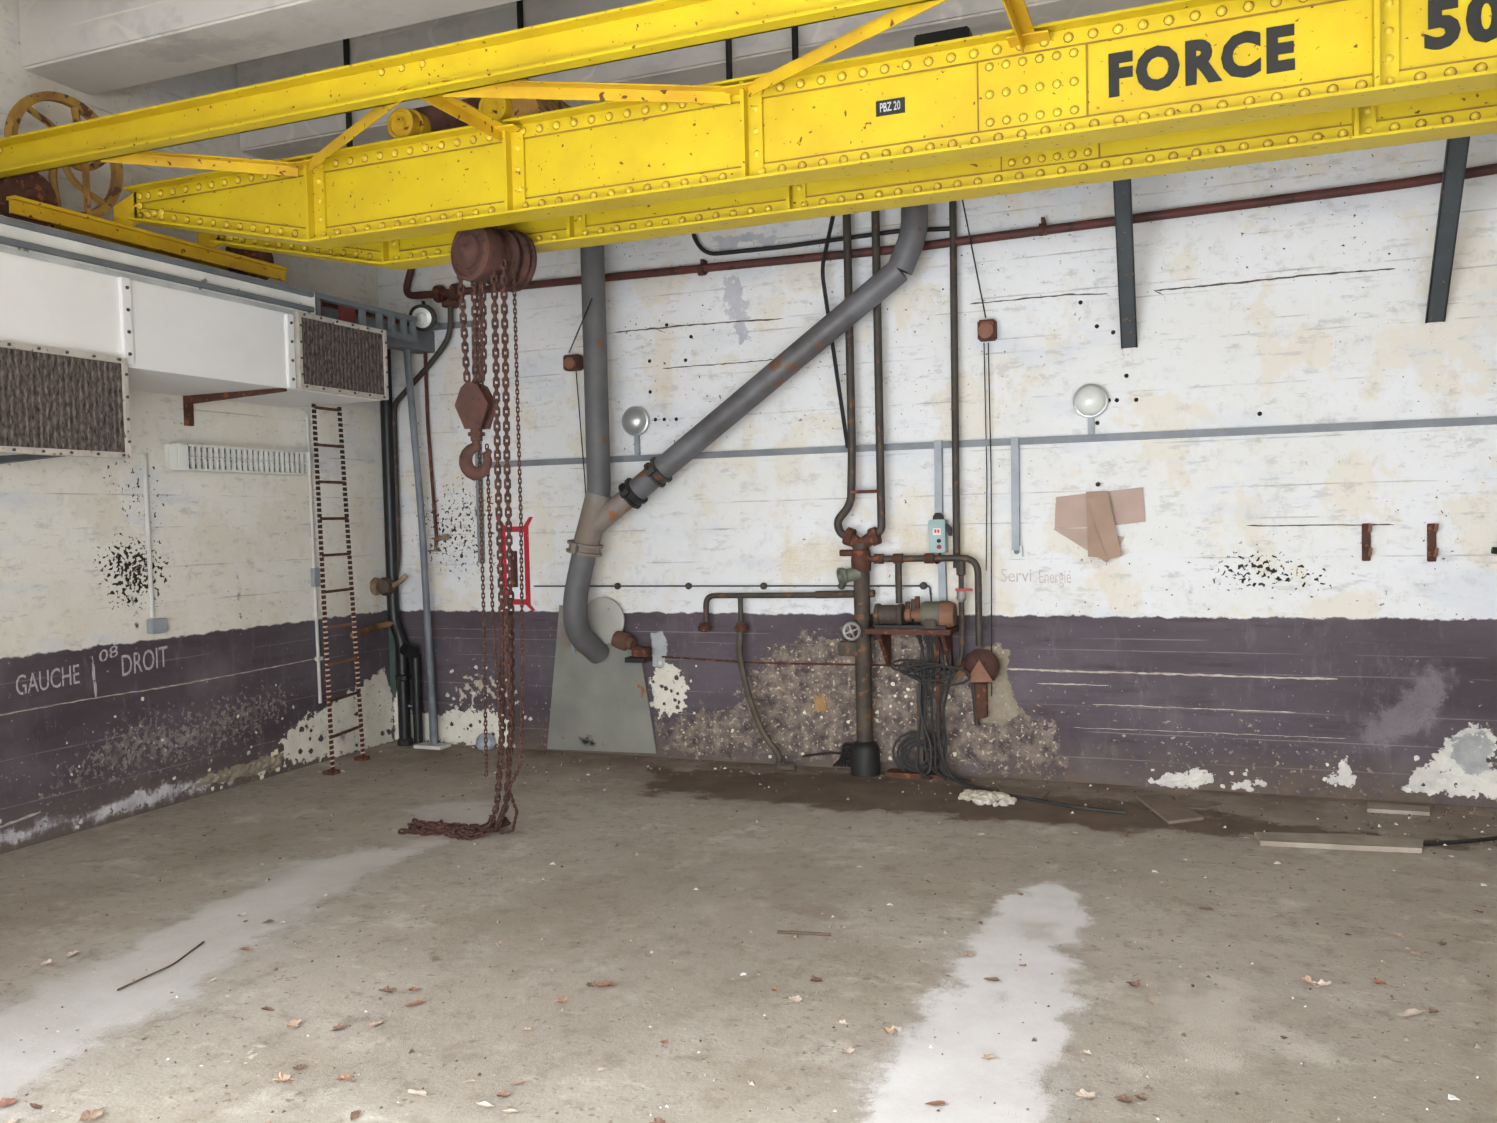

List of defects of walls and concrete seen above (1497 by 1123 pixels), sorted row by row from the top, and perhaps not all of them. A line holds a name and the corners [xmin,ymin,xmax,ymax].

leakage [94,461,171,630]
leakage [416,475,500,579]
leakage [1209,543,1326,595]
leakage [0,751,271,852]
peeling [38,665,532,803]
peeling [648,621,1072,779]
peeling [1322,755,1357,788]
peeling [1401,722,1497,800]
leakage [0,798,523,1123]
leakage [165,829,1412,1123]